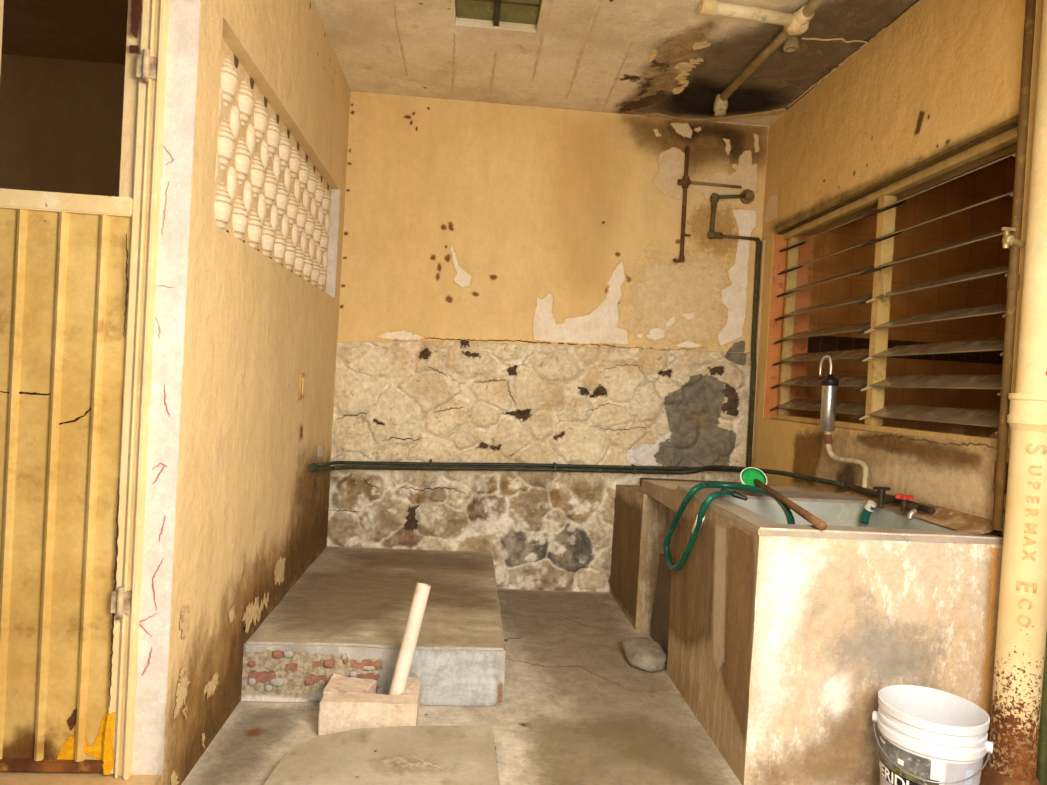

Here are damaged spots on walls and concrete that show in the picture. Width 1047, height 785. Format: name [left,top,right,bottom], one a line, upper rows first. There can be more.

damp [915,111,930,134]
peeling [532,22,786,349]
damp [774,116,1018,231]
crack [425,337,705,377]
crack [586,403,650,431]
crack [363,478,464,493]
peeling [228,556,286,633]
damp [164,459,493,785]
peeling [173,667,190,720]
peeling [204,672,220,699]